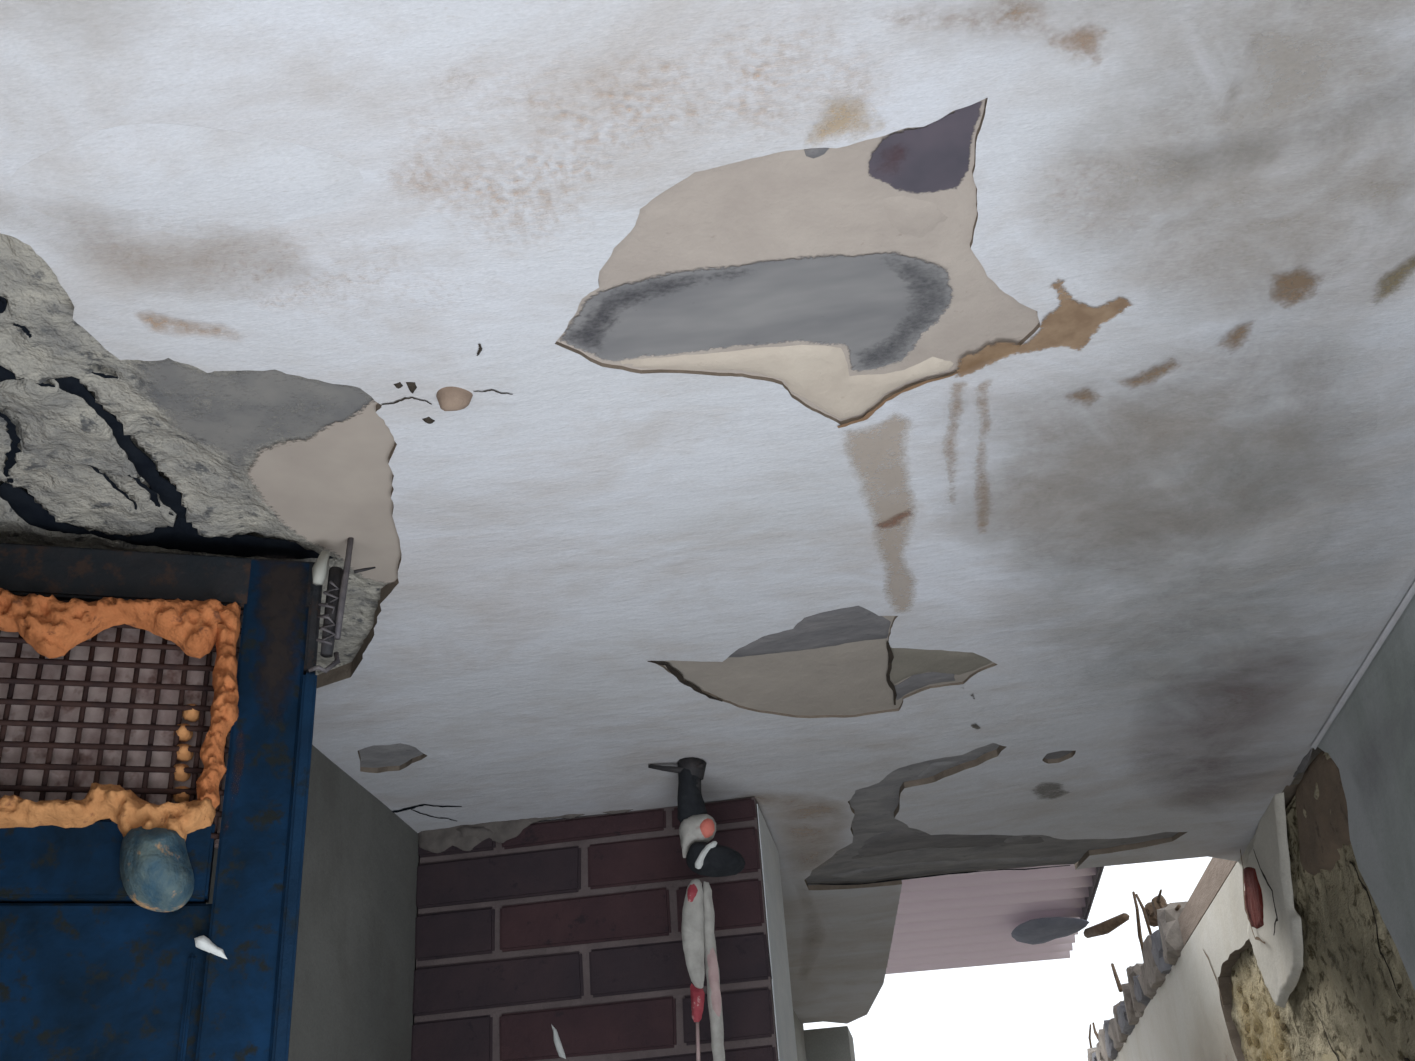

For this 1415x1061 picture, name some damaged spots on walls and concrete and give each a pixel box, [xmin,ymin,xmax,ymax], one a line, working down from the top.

peeling [557,98,1039,428]
rust [955,280,1131,409]
leakage [1130,364,1174,386]
leakage [1227,327,1247,346]
leakage [1275,272,1315,304]
leakage [1381,260,1415,297]
spalling [0,233,402,675]
leakage [850,418,912,610]
peeling [647,606,994,716]
spalling [806,743,1179,885]
spalling [1231,748,1415,1061]